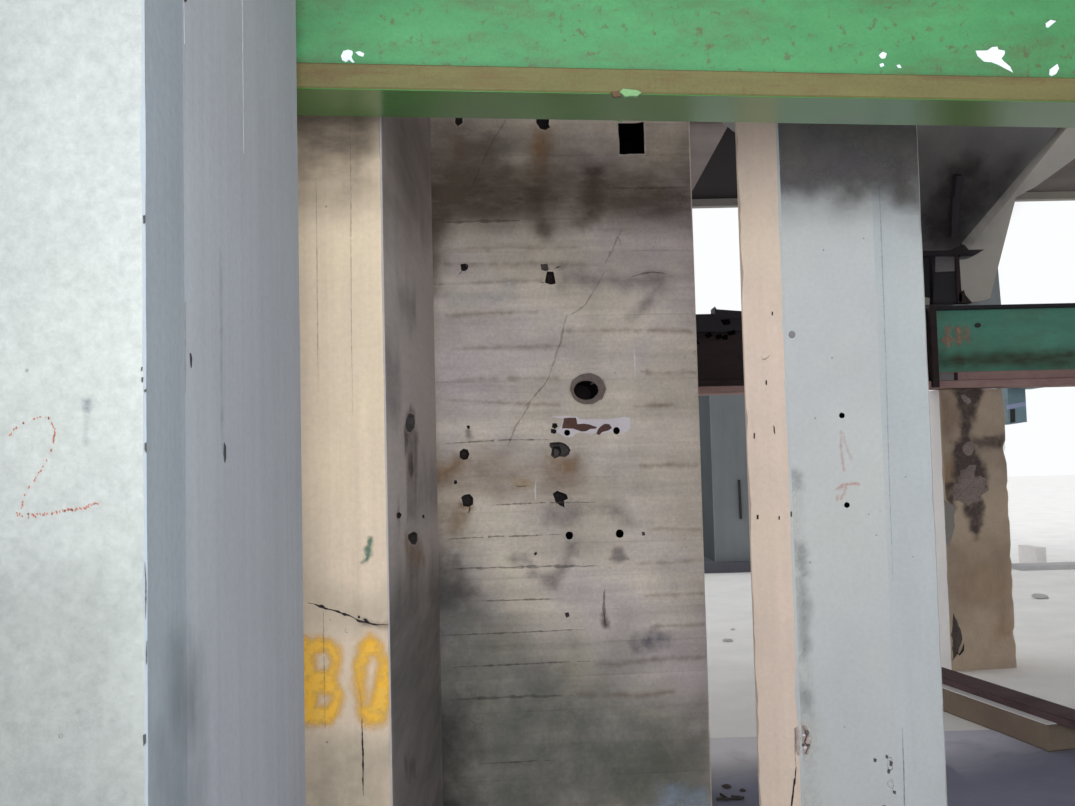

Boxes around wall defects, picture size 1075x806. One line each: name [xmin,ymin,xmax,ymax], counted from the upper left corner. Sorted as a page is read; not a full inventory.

peeling [341,50,364,63]
peeling [976,47,1013,72]
spalling [549,418,612,468]
damp [945,388,1003,534]
crack [310,603,388,625]